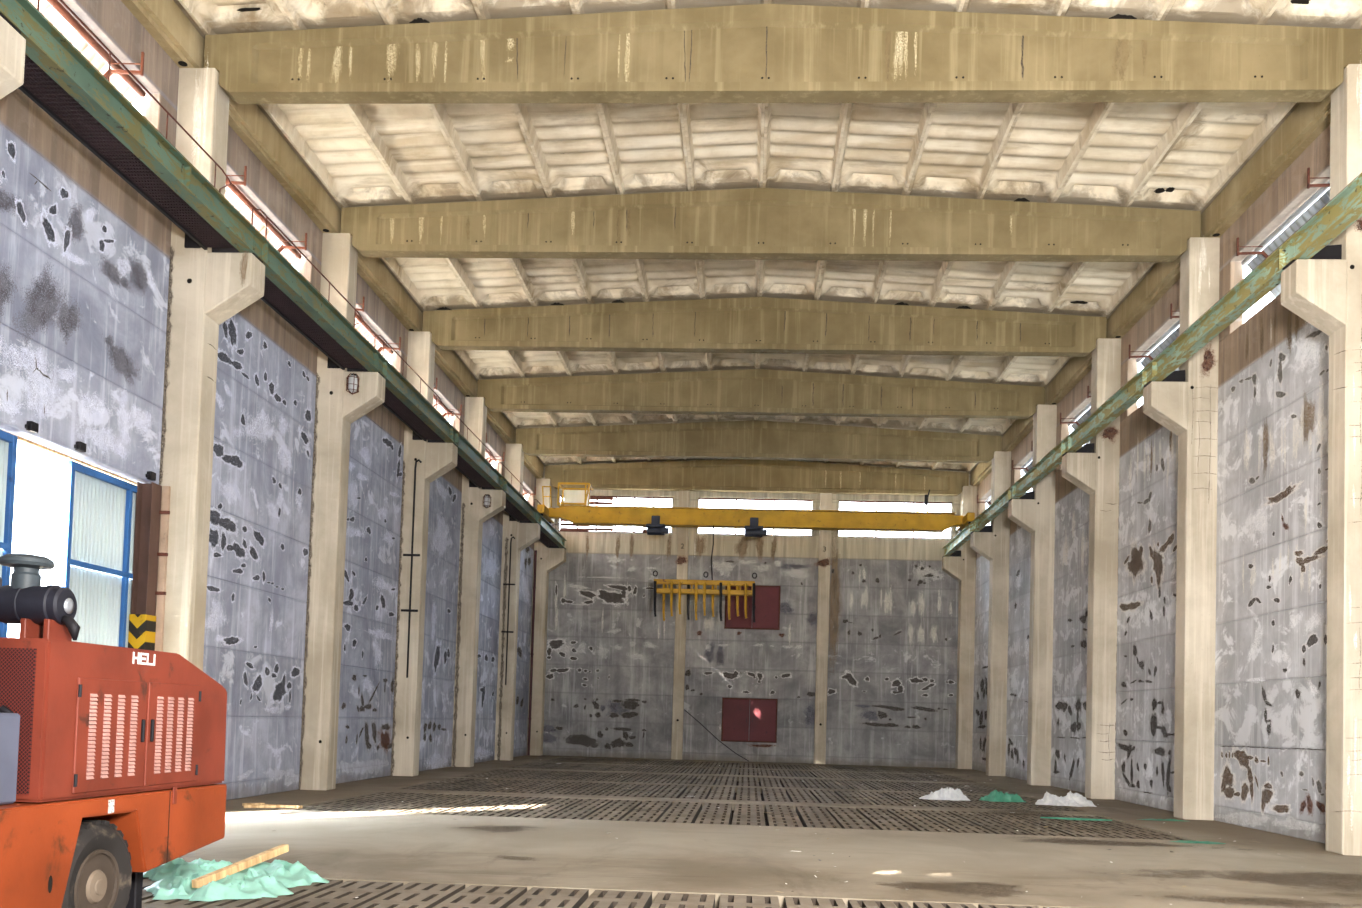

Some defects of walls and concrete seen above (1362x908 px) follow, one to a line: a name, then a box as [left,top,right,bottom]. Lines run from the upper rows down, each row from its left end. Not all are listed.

damp [0,140,158,463]